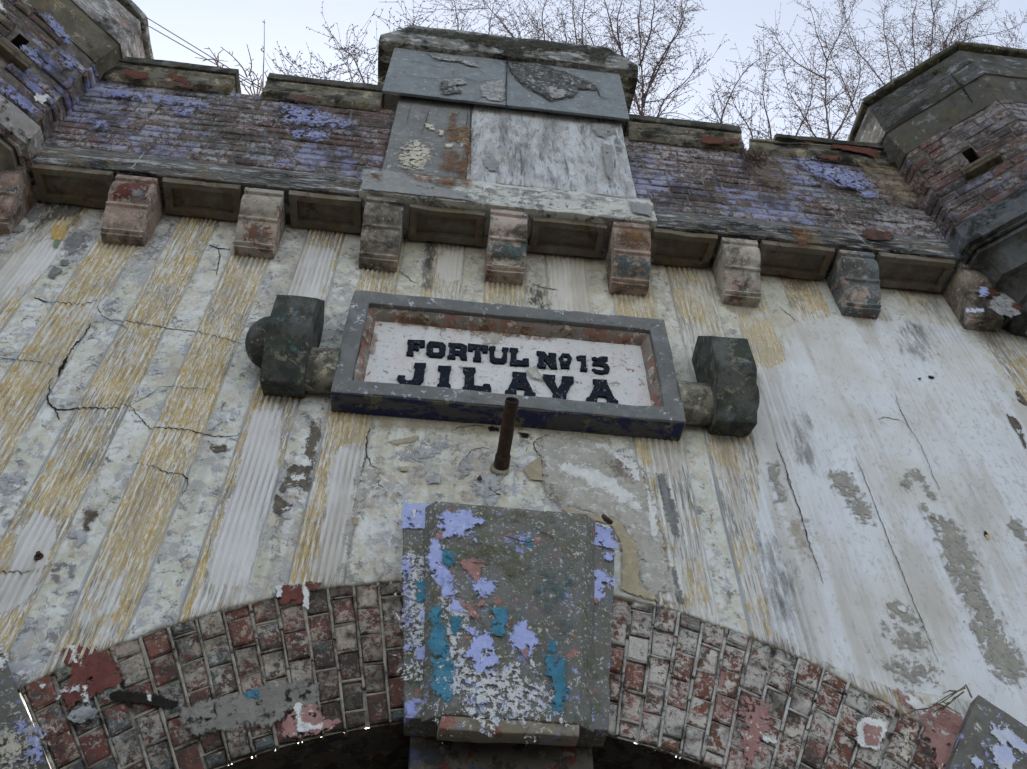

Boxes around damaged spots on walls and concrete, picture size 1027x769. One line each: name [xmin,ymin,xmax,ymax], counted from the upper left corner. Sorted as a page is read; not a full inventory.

peeling [39,12,77,71]
peeling [0,85,50,117]
spalling [438,61,600,101]
peeling [390,123,472,172]
crack [0,297,241,437]
spalling [1007,414,1027,449]
peeling [272,421,322,517]
spalling [524,433,685,605]
peeling [389,503,596,744]
peeling [0,643,179,769]
peeling [281,702,341,739]
peeling [971,720,1027,769]